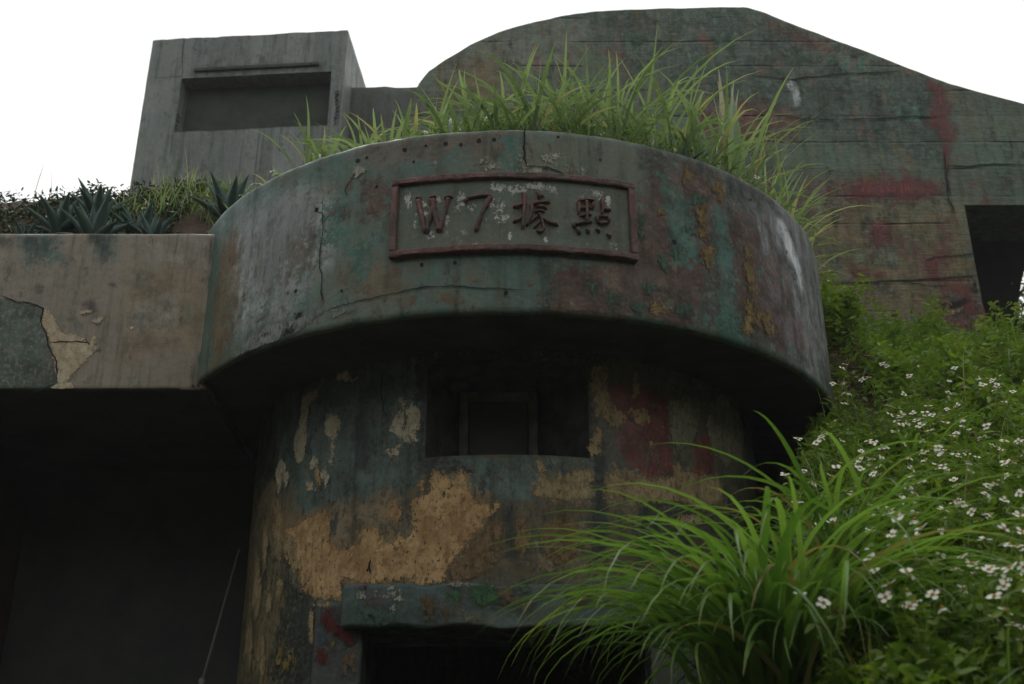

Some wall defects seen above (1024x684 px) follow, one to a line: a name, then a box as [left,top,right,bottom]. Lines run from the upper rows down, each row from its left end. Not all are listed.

crack [523,127,563,174]
crack [314,175,524,312]
peeling [39,307,103,389]
peeling [586,364,652,457]
peeling [244,386,584,677]
peeling [525,456,724,525]